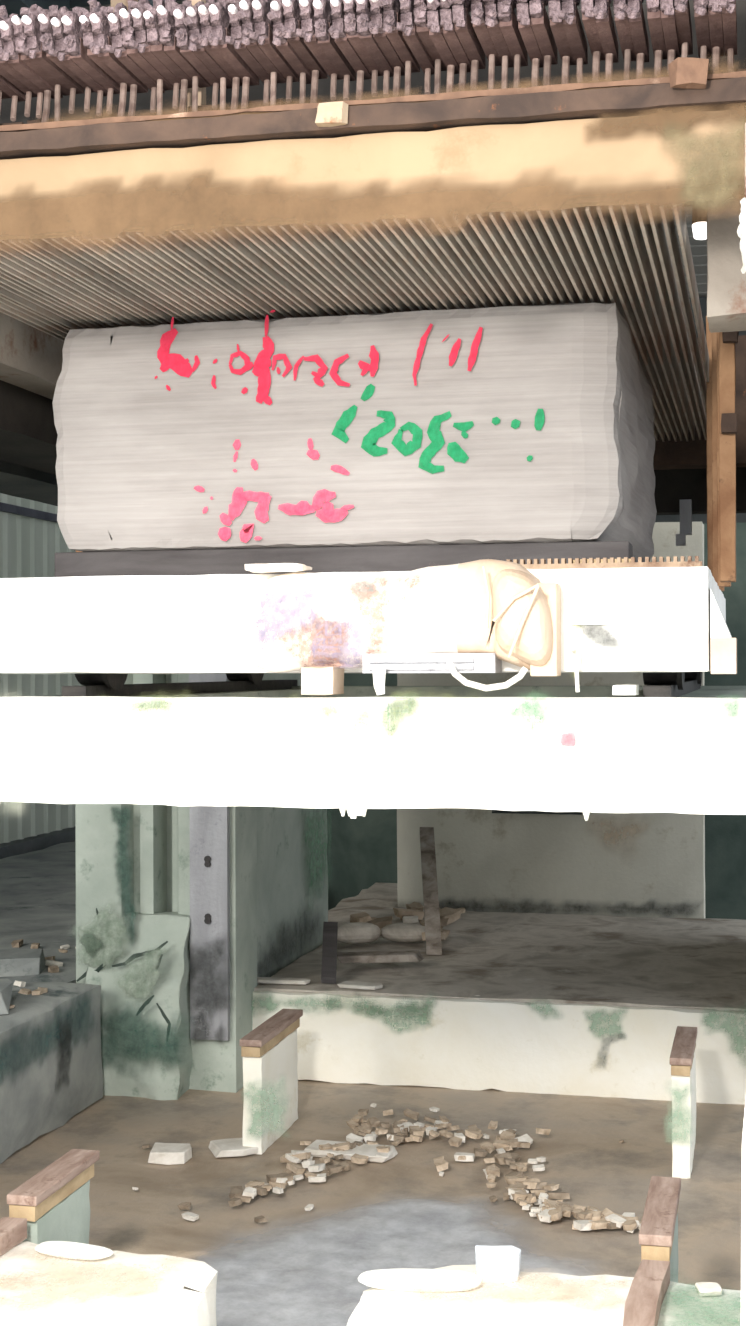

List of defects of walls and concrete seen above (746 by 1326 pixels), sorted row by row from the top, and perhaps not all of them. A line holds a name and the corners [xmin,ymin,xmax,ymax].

leakage [0,943,227,1088]
leakage [251,996,432,1031]
leakage [589,1012,622,1065]
leakage [704,1012,746,1053]
leakage [246,1087,283,1135]